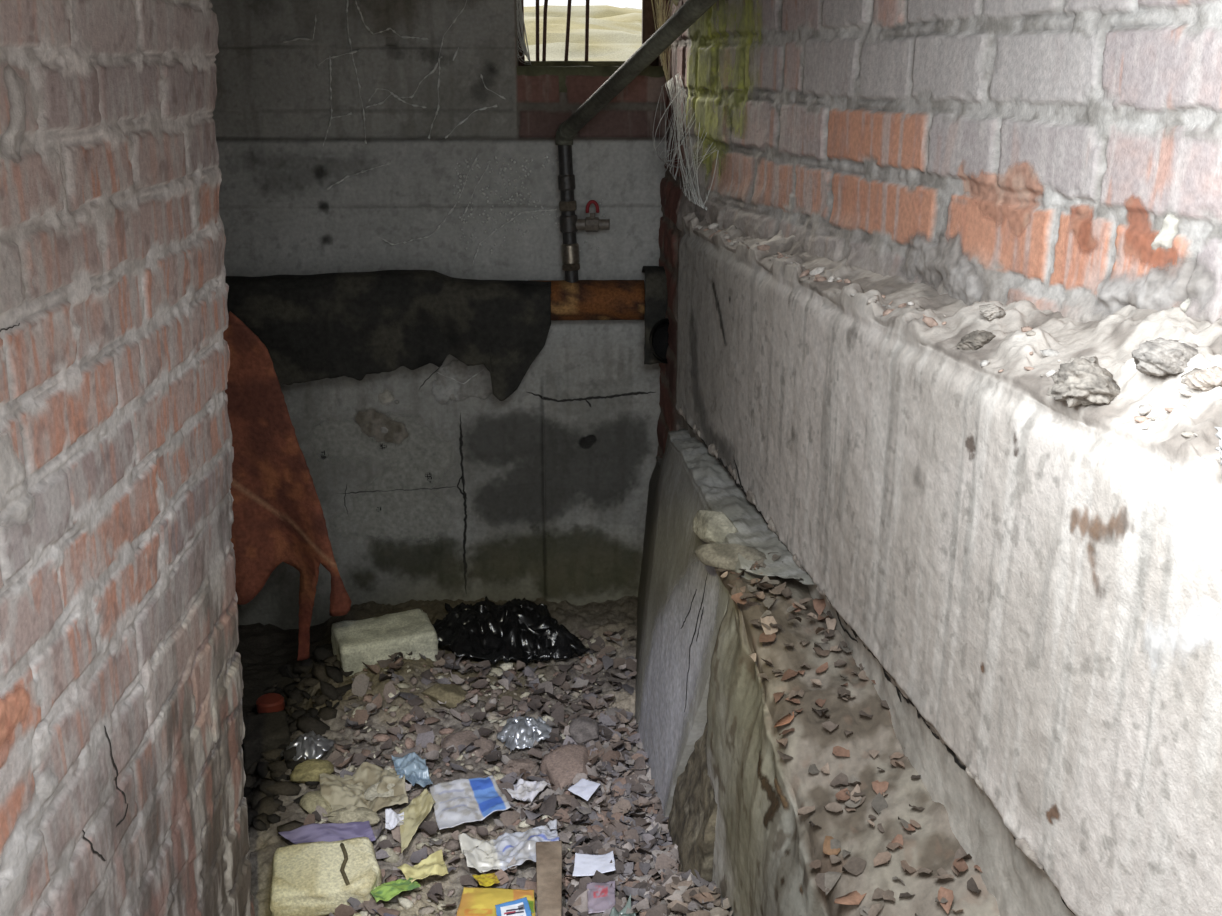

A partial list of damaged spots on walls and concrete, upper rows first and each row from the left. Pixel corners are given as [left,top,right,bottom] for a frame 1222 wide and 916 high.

spalling [958,163,1043,236]
spalling [1070,205,1096,252]
spalling [1124,196,1178,270]
spalling [432,360,493,404]
flaking render [0,434,35,526]
crack [337,413,467,590]
water stain [311,414,645,597]
crack [689,426,789,551]
spalling [0,687,30,747]
crack [836,611,967,770]
flaking render [0,769,58,916]